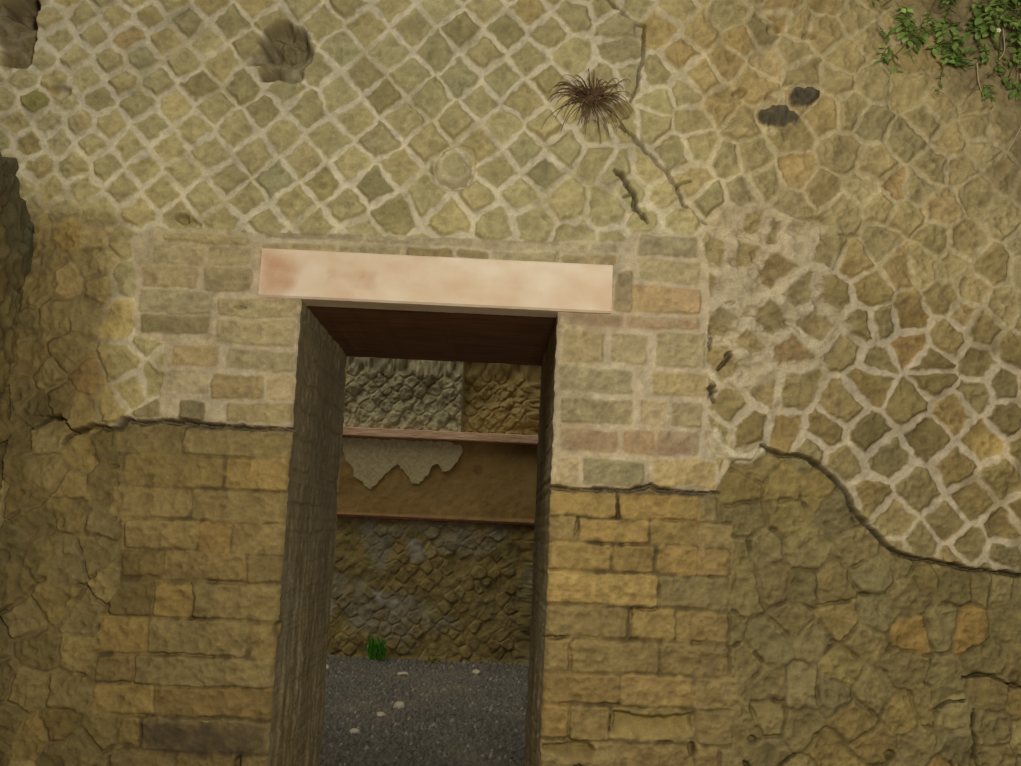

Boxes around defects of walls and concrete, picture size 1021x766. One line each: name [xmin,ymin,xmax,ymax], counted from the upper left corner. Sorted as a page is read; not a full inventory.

crack [606,0,708,225]
crack [0,384,296,501]
peeling [342,437,463,489]
crack [549,482,721,519]
crack [759,442,1021,579]
crack [742,758,753,766]
crack [778,753,797,766]
crack [934,671,1021,766]